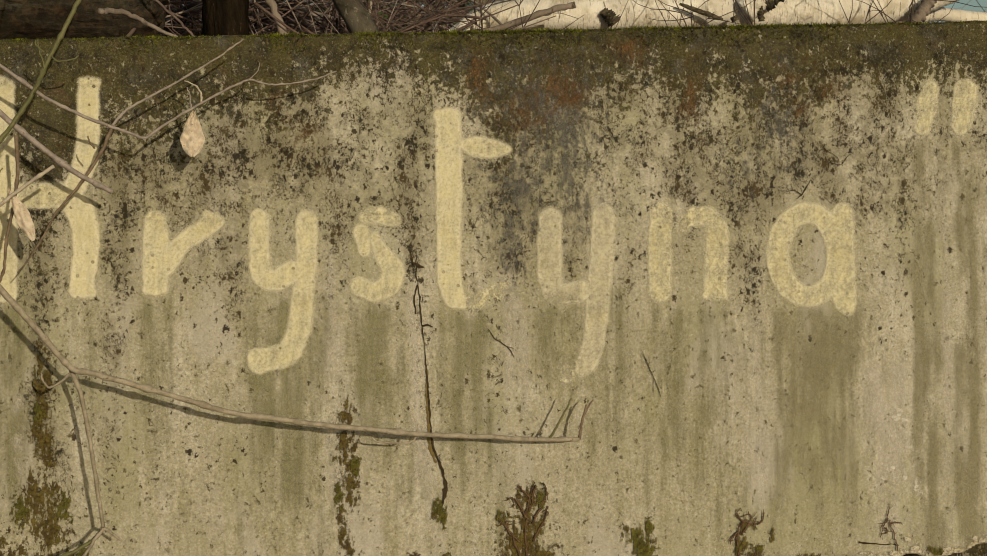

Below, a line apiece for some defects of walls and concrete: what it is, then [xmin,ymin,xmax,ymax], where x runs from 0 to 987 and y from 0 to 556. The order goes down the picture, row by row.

leakage [273,303,290,357]
crack [411,254,448,504]
leakage [488,62,610,273]
leakage [869,263,980,551]
leakage [956,199,977,320]